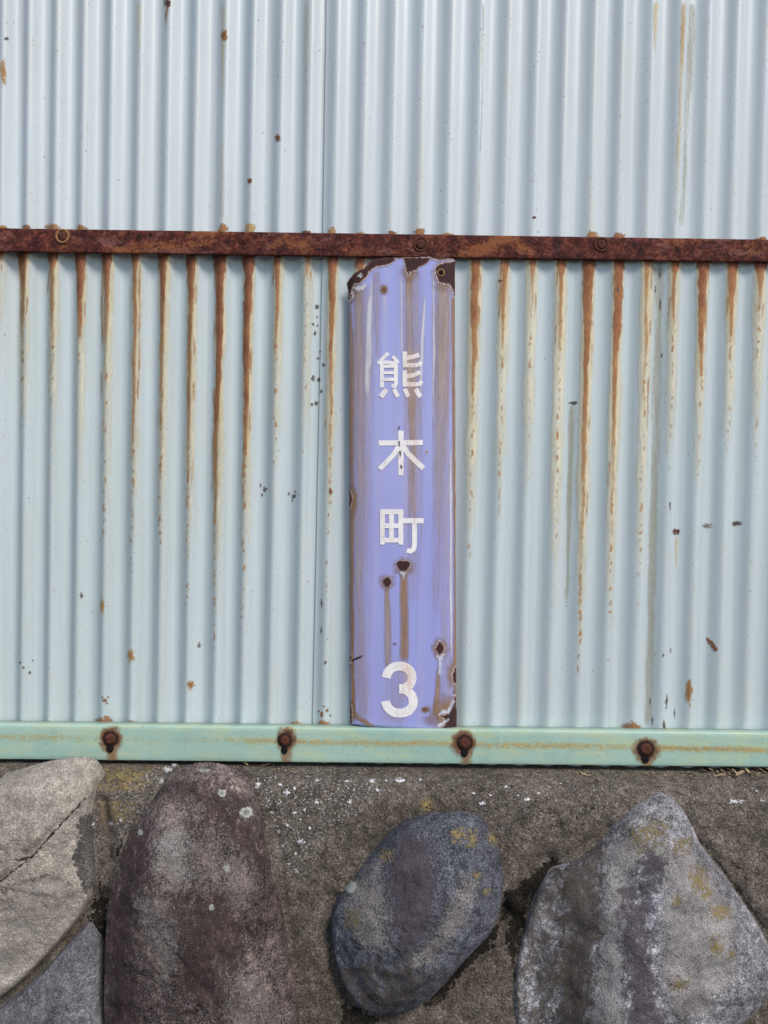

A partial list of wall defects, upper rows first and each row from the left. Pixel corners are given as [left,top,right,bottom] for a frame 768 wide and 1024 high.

corrosion [0,223,768,657]
corrosion [685,680,694,706]
corrosion [94,715,122,760]
corrosion [202,721,768,766]
crack [0,798,86,884]